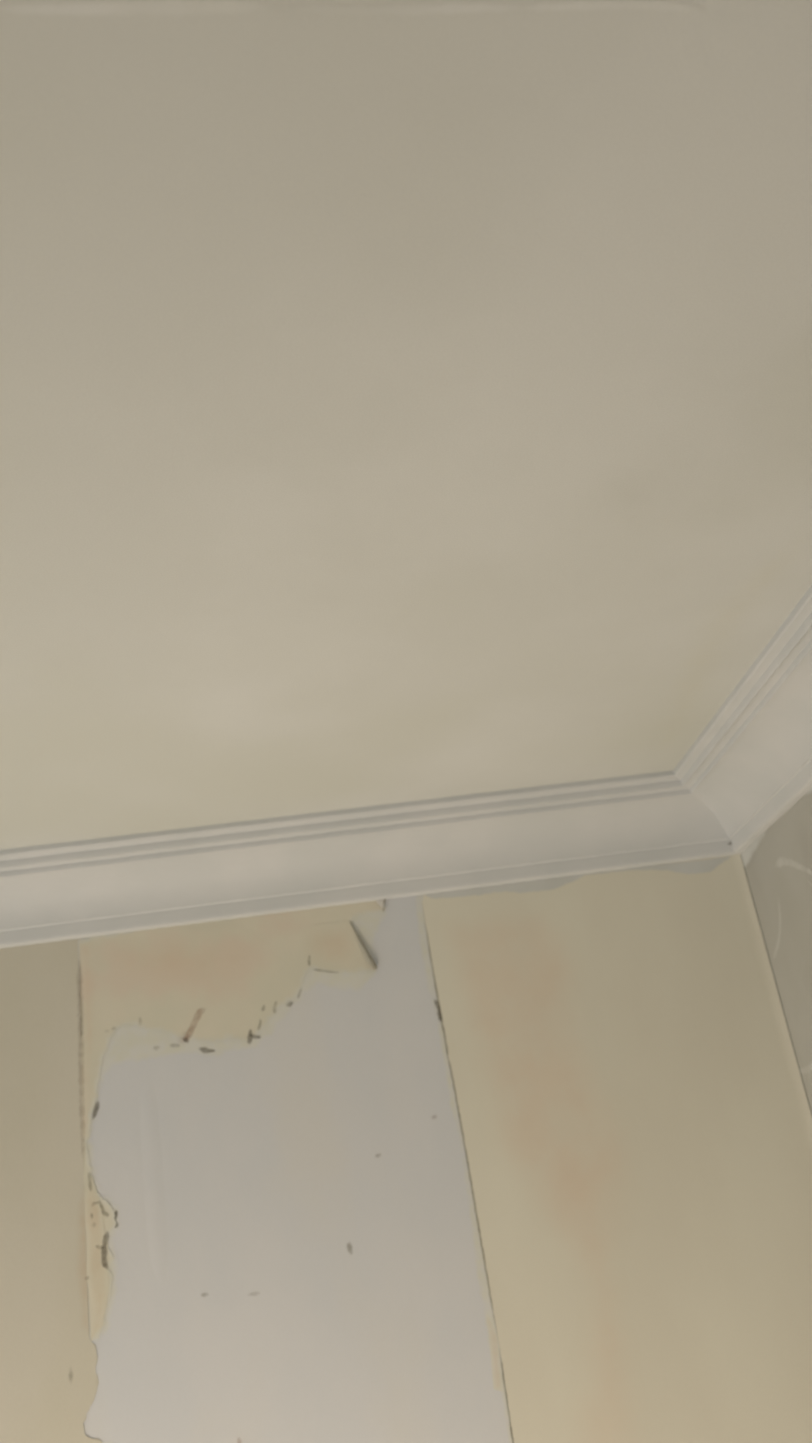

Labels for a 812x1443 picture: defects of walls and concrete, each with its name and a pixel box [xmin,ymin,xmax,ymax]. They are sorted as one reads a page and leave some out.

peeling [83,896,508,1443]